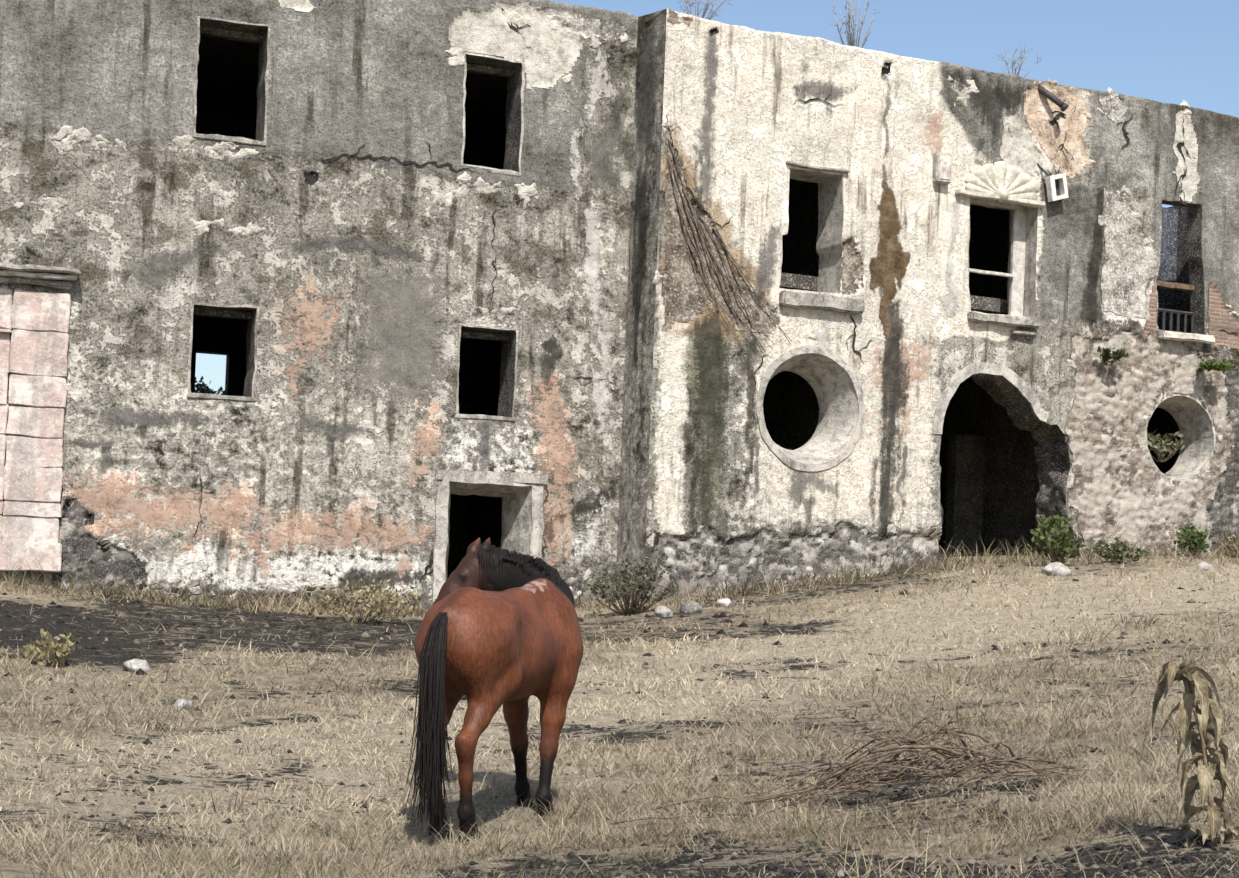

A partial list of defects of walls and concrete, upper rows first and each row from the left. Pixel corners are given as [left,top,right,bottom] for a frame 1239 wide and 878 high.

peeling [278,0,321,12]
peeling [445,1,628,89]
damp [946,70,1030,160]
peeling [1000,79,1128,179]
peeling [1172,100,1200,202]
damp [756,225,780,295]
damp [693,311,729,531]
damp [743,339,757,484]
damp [869,300,936,538]